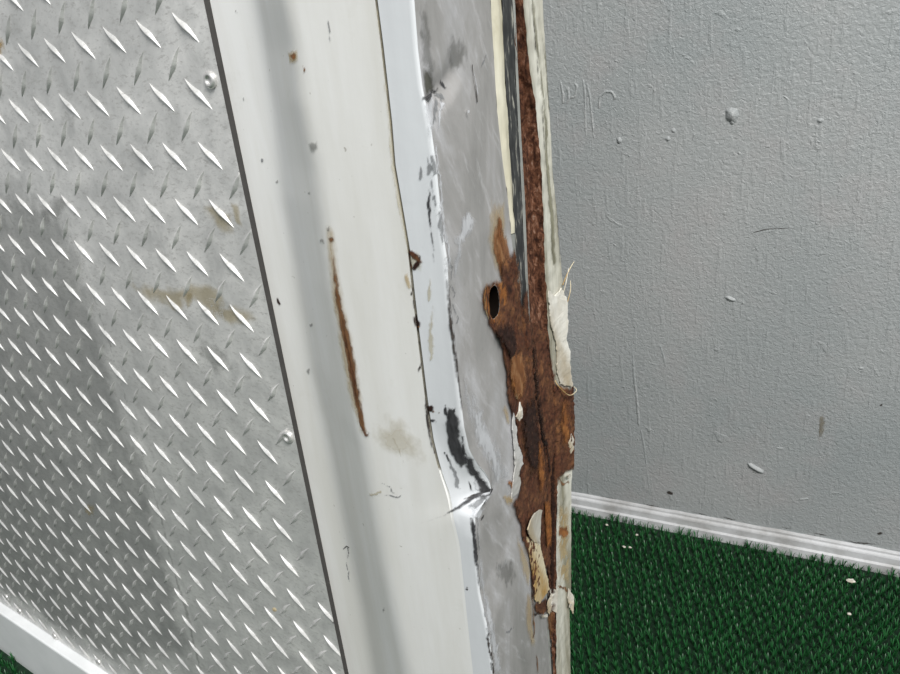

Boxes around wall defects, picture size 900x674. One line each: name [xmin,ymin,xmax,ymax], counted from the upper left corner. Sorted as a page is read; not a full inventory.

peeling [435,146,474,274]
corrosion [334,268,368,436]
peeling [548,262,577,396]
peeling [468,389,524,499]
corrosion [483,217,575,638]
peeling [526,510,574,618]